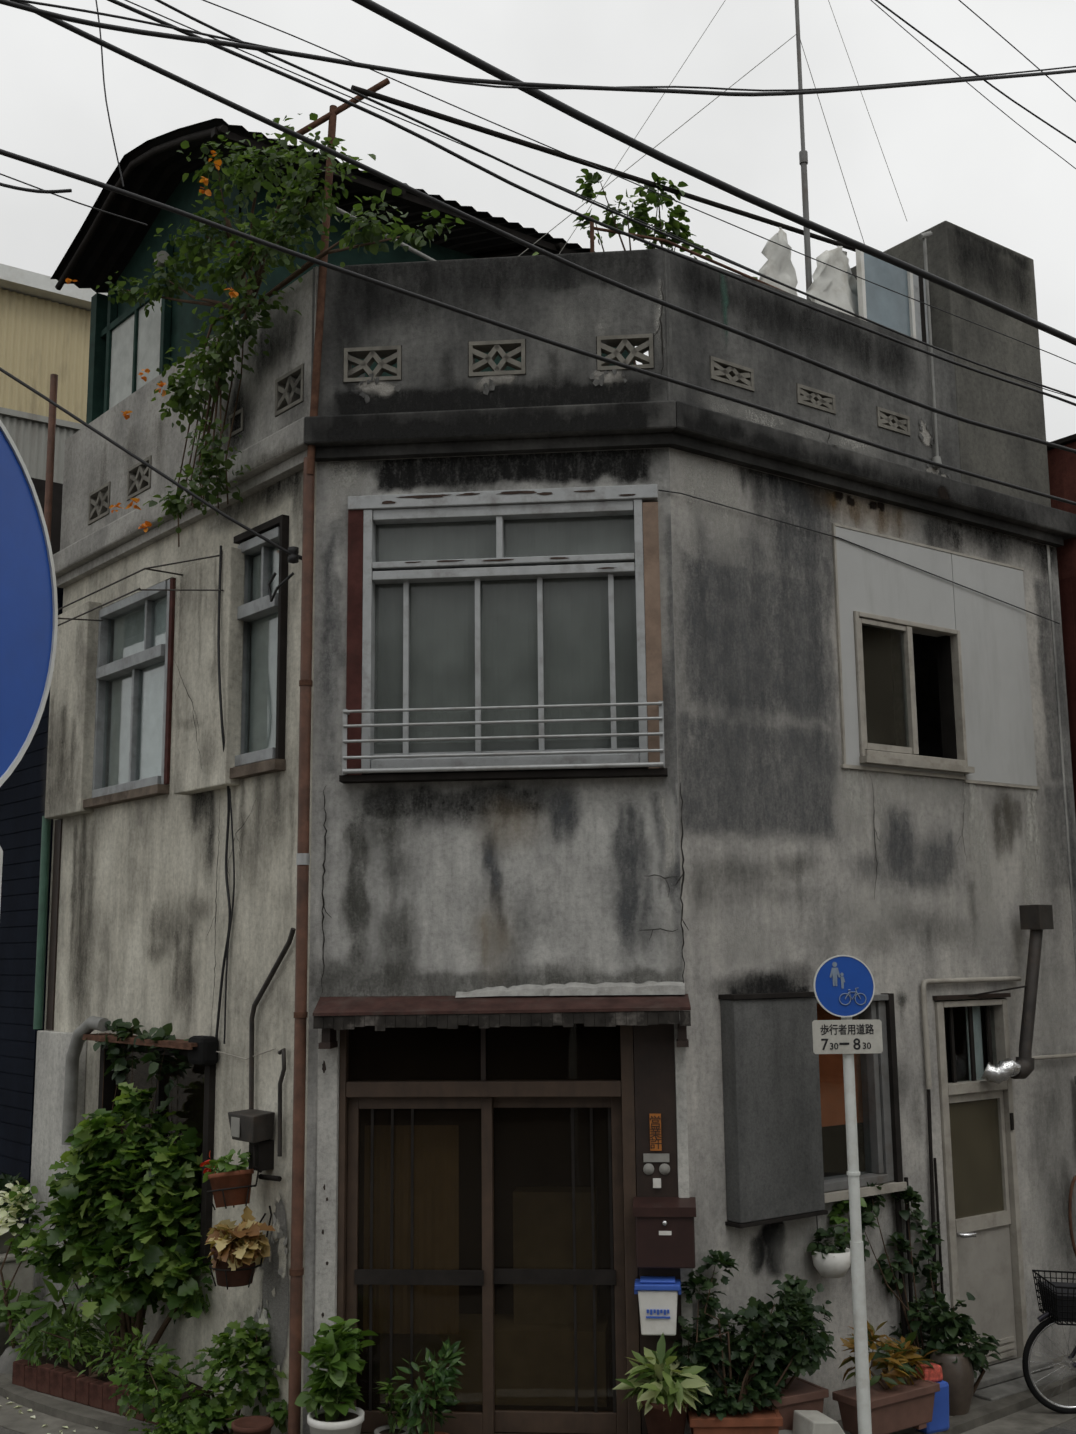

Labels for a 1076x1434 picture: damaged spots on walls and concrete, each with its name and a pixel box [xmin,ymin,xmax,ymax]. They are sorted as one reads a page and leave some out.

leakage [955,227,1028,286]
leakage [689,415,939,497]
leakage [933,517,1058,566]
leakage [656,468,888,881]
leakage [317,784,678,999]